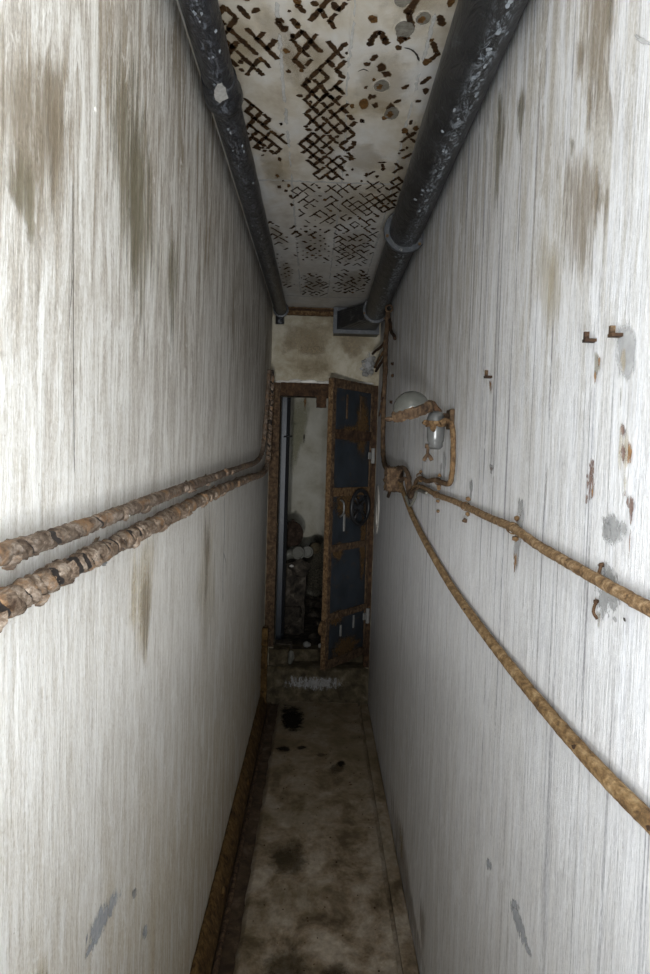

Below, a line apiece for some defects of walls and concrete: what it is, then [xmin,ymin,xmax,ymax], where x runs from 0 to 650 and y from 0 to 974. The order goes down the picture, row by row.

rust [437,0,455,27]
rust [220,0,441,296]
leakage [12,158,34,237]
leakage [110,63,159,321]
leakage [169,252,178,335]
rust [585,459,595,504]
peeling [602,515,626,545]
rust [626,496,634,552]
leakage [282,705,304,731]